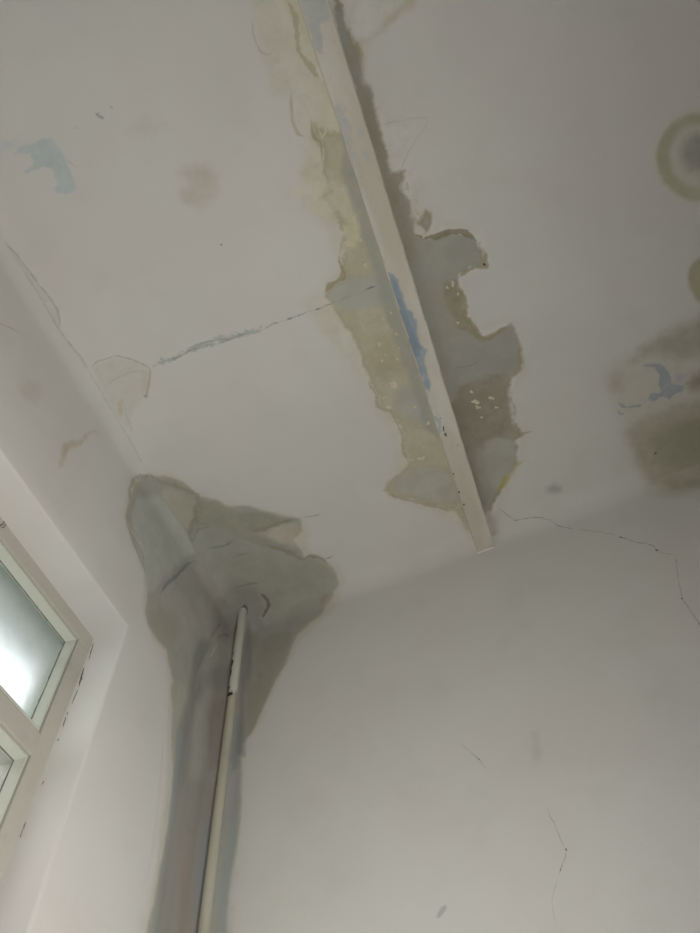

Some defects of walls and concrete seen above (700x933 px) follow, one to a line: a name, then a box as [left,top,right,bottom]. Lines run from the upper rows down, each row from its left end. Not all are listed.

peeling [332,100,386,254]
damp [647,102,700,210]
crack [149,285,383,371]
damp [239,0,474,545]
peeling [386,268,444,439]
damp [329,0,535,536]
damp [594,256,700,503]
crack [497,508,700,626]
damp [119,465,350,933]